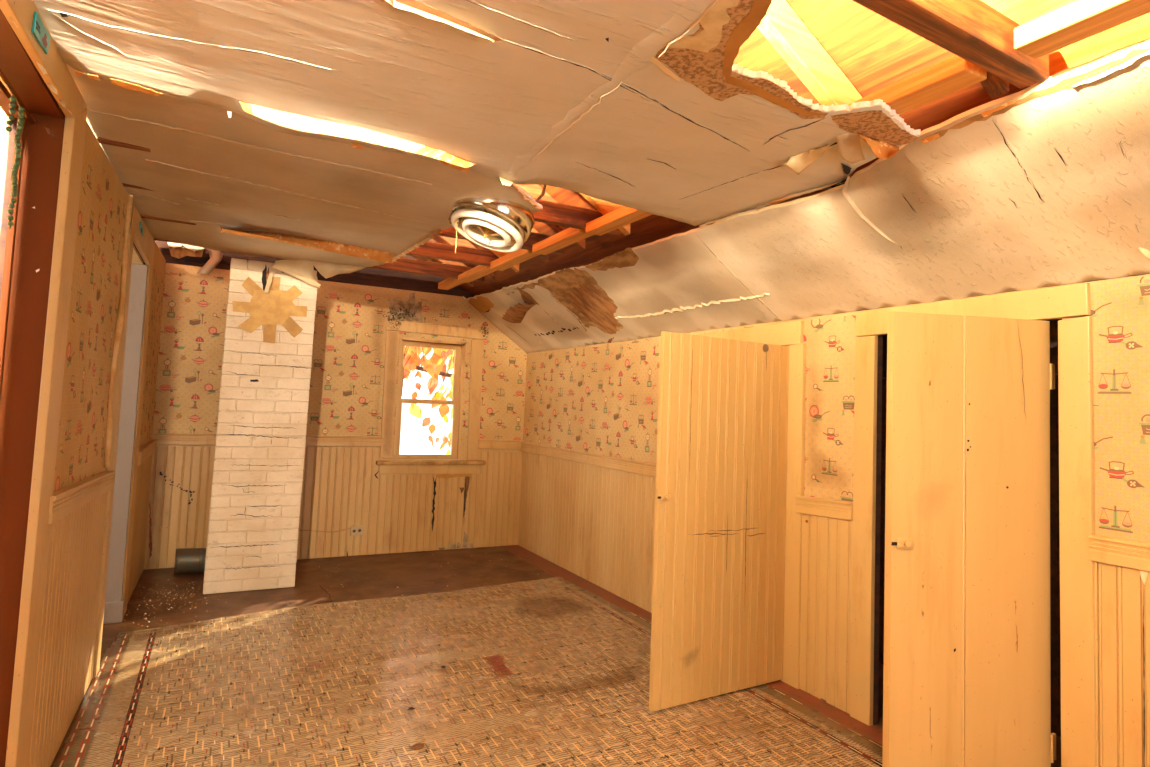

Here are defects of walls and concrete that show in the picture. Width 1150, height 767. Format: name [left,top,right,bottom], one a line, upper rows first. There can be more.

crack [47,9,331,70]
crack [469,0,831,201]
crack [89,110,432,185]
crack [145,159,425,233]
peeling [167,242,223,275]
peeling [220,228,394,263]
flaking render [388,293,422,322]
peeling [469,248,639,343]